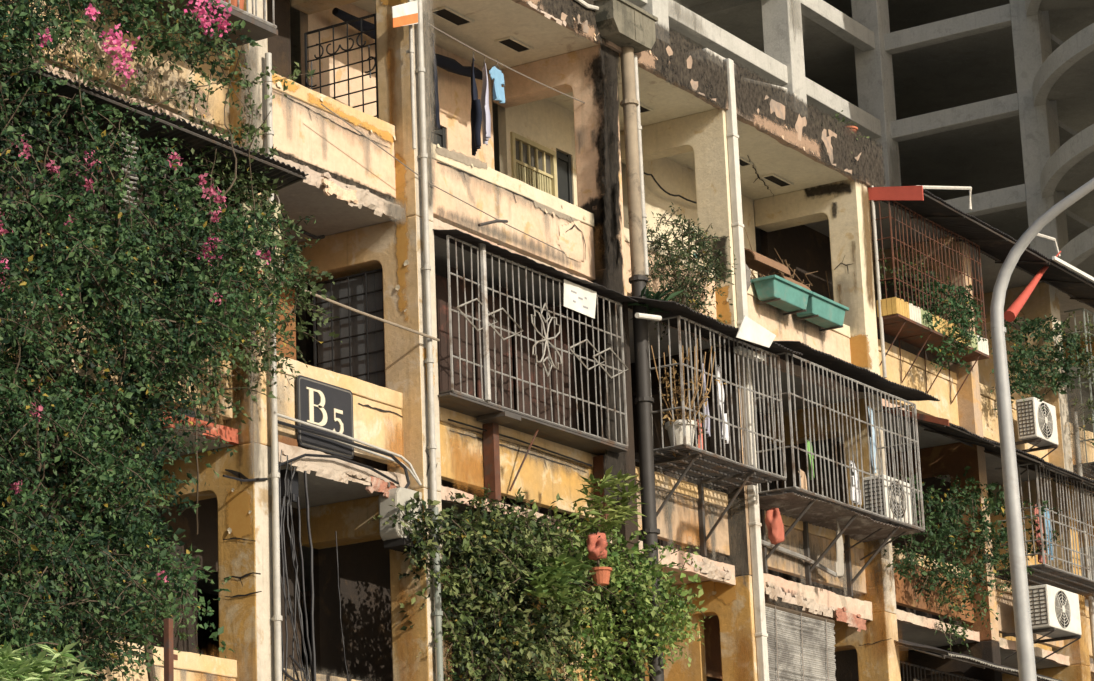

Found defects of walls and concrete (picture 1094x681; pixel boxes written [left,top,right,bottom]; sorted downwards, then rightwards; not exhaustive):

spalling [526,0,596,41]
peeling [634,51,658,68]
peeling [754,115,821,157]
peeling [272,74,409,320]
water stain [536,0,627,501]
spalling [279,450,397,498]
spalling [765,581,866,632]